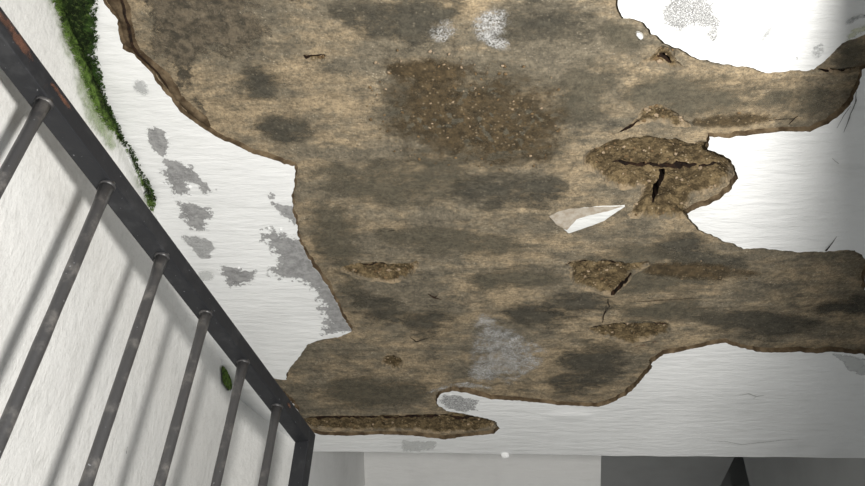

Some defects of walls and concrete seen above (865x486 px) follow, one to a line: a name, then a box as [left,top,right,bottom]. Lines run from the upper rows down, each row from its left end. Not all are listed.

damp [256,116,313,145]
damp [329,62,604,211]
damp [378,228,521,256]
flaking render [103,0,865,439]
damp [329,233,865,409]